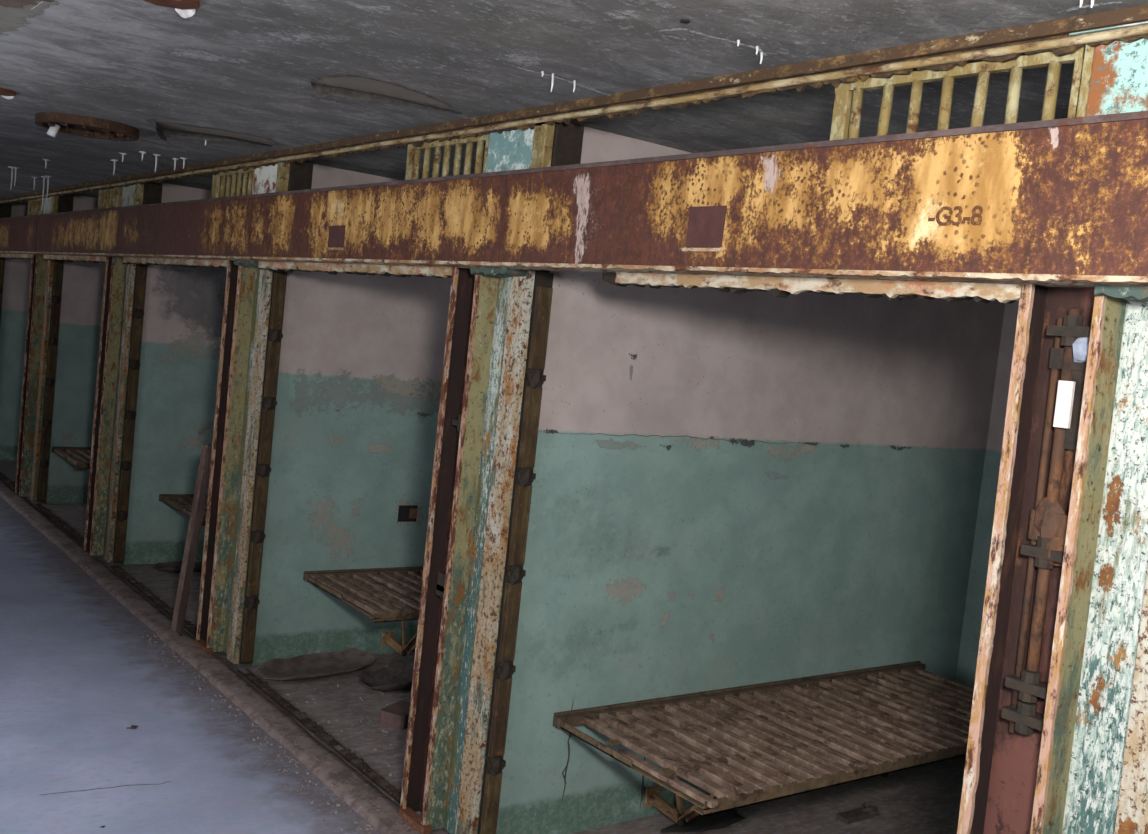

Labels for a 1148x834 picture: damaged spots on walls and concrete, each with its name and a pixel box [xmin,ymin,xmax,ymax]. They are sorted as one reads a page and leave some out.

flaking render [0,0,59,36]
peeling [539,429,818,480]
rust [1102,472,1123,536]
rust [1098,563,1115,592]
rust [1090,674,1105,718]
crack [562,704,573,799]
rust [1114,815,1148,834]